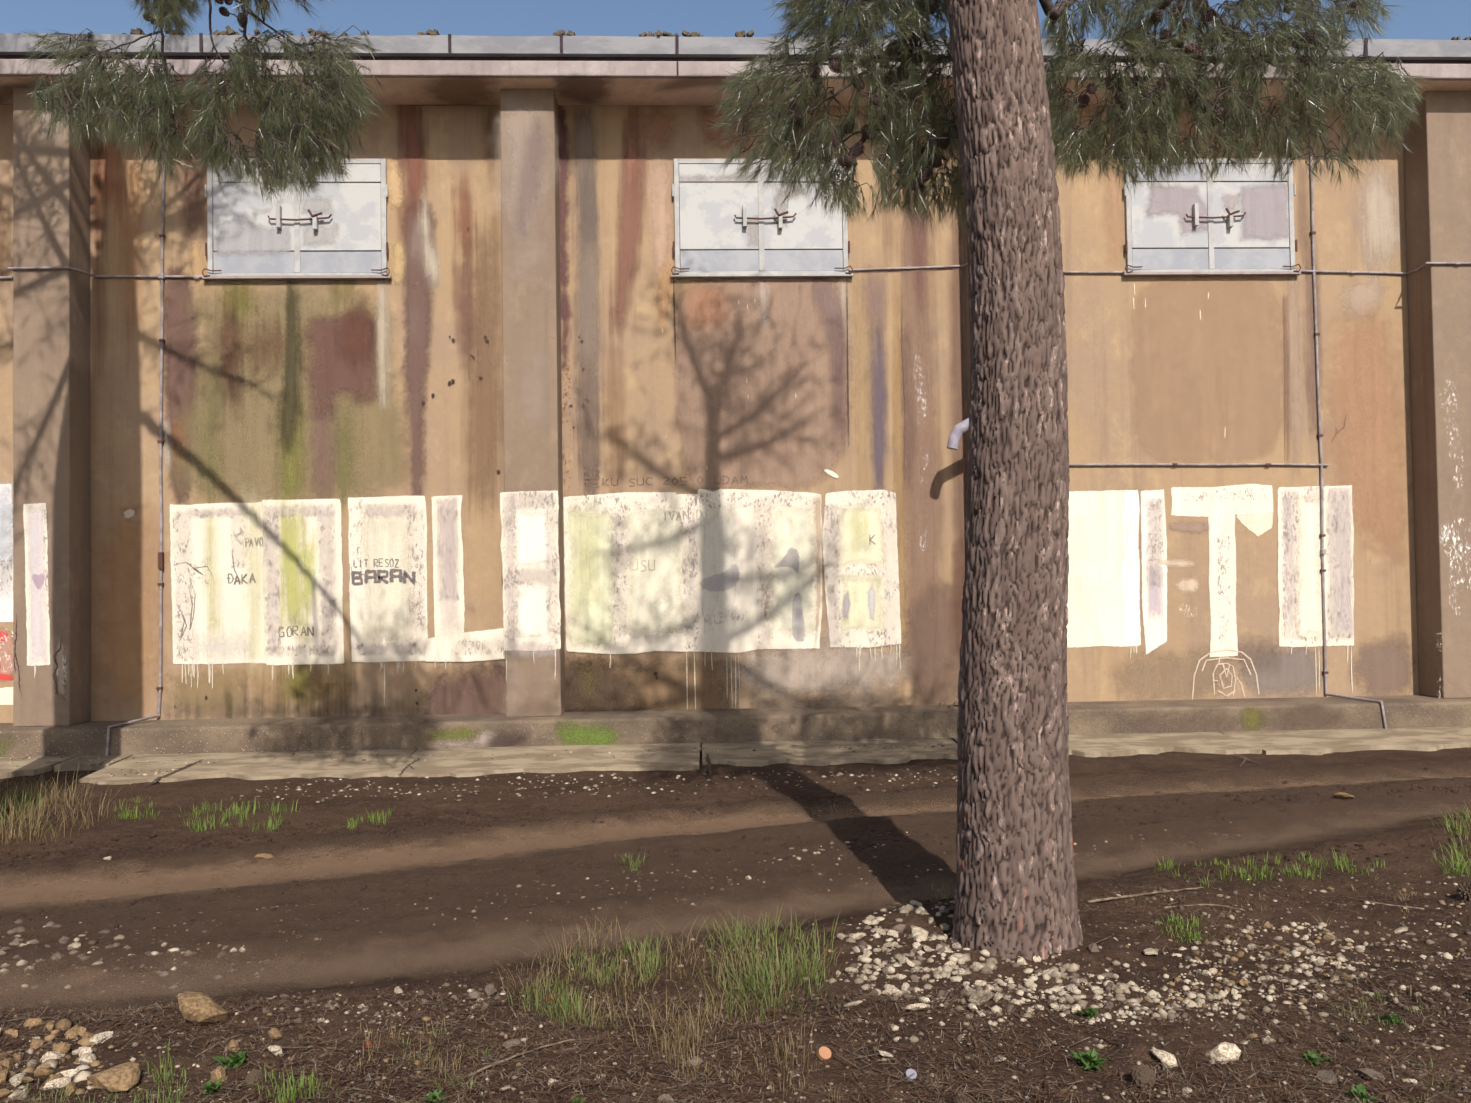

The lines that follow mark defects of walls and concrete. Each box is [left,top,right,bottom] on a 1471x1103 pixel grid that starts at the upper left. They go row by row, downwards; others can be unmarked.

water stain [164,136,438,502]
rust [397,105,425,205]
rust [616,115,643,326]